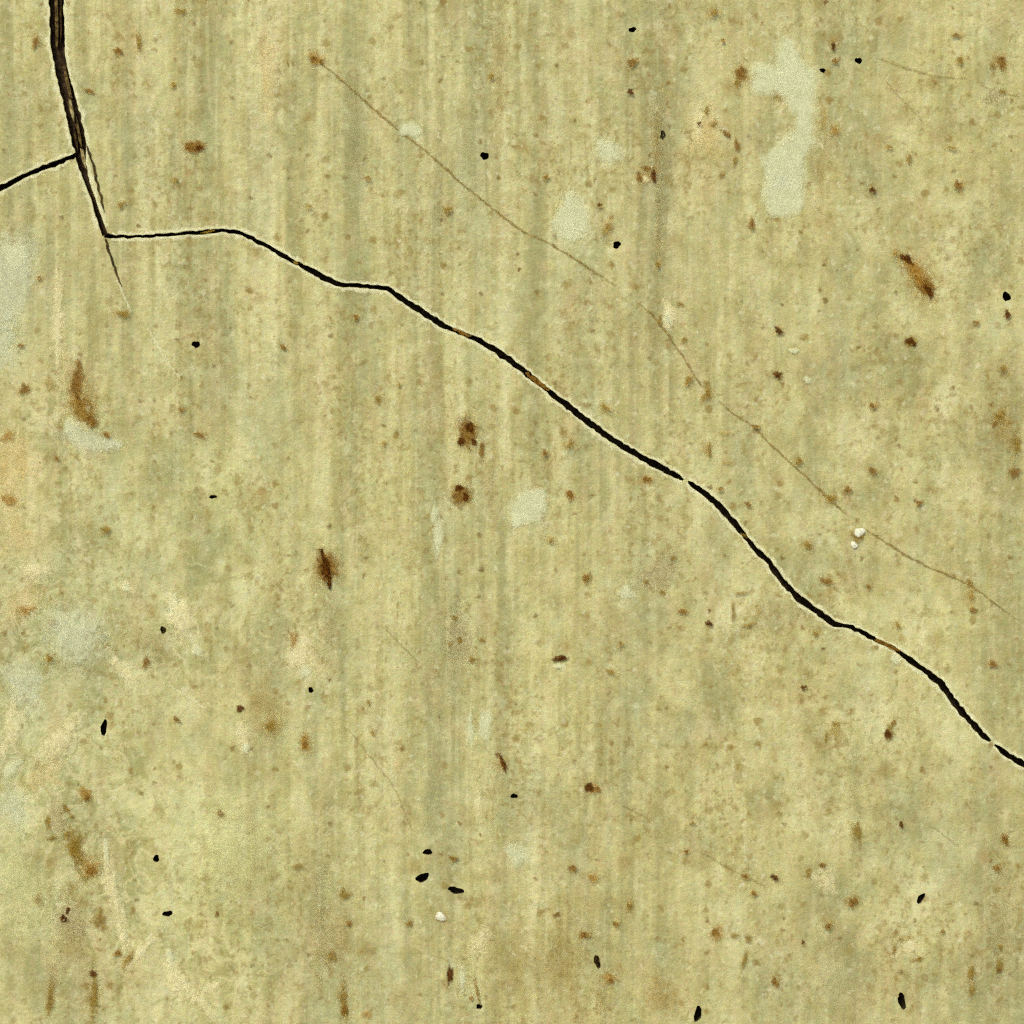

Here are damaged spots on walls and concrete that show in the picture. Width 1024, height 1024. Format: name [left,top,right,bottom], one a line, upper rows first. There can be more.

corrosion [894,251,935,299]
corrosion [68,354,109,438]
crack [0,0,1024,769]
corrosion [458,417,484,456]
corrosion [451,485,470,508]
corrosion [316,549,339,589]